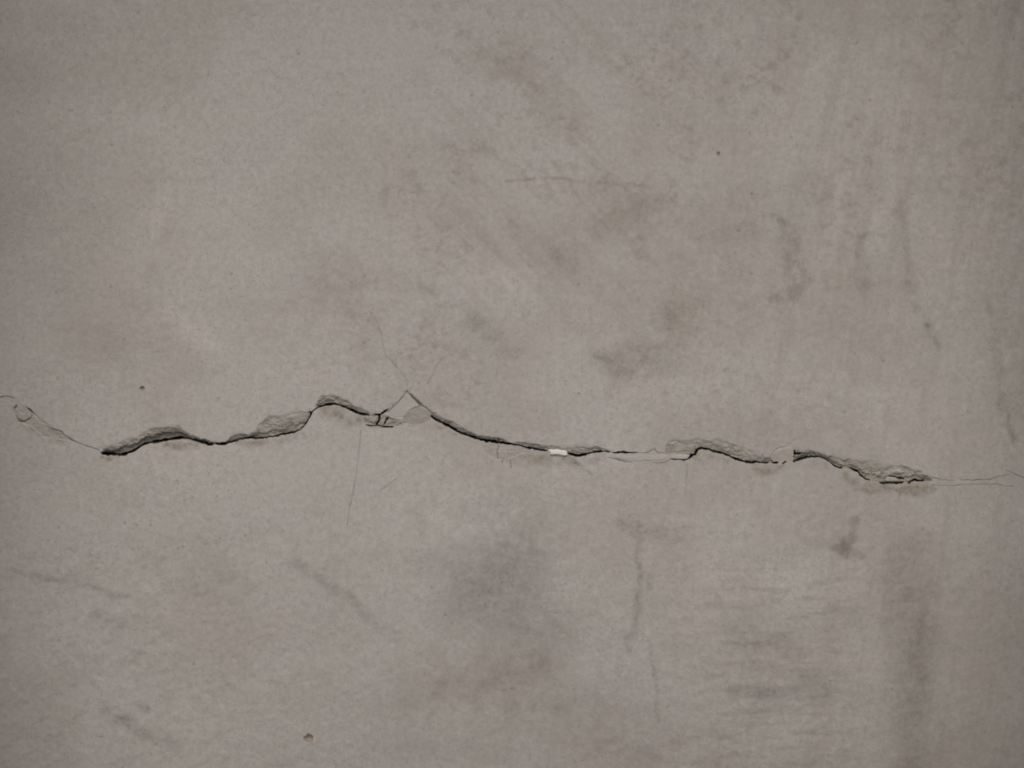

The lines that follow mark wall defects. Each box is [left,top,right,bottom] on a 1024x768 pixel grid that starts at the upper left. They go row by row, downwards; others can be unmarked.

crack [0,312,1024,527]